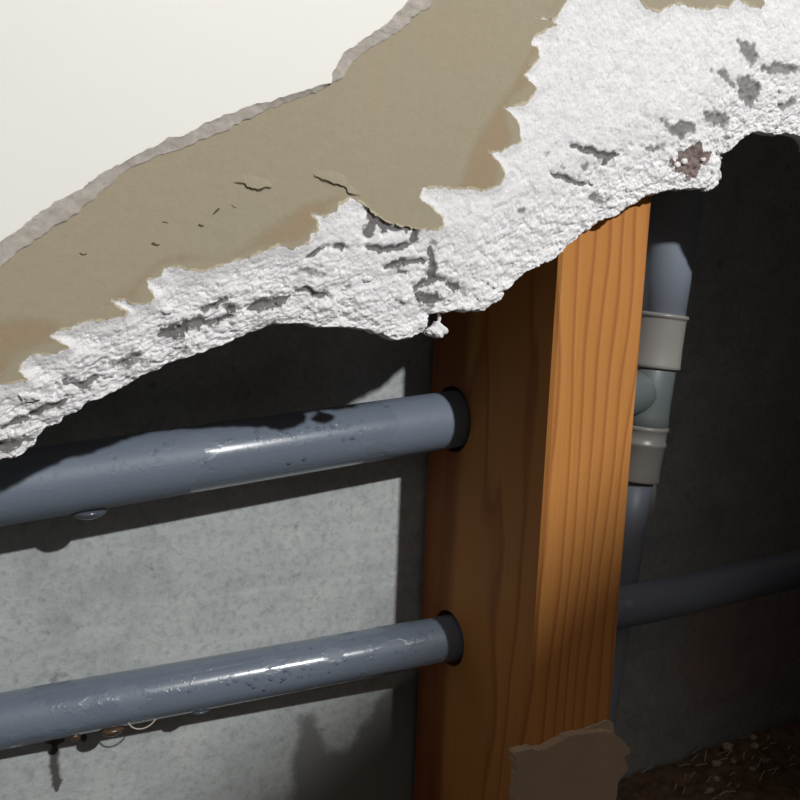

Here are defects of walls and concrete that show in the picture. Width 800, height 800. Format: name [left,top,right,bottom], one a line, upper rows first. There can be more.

spalling [0,0,800,459]
damp [666,140,712,182]